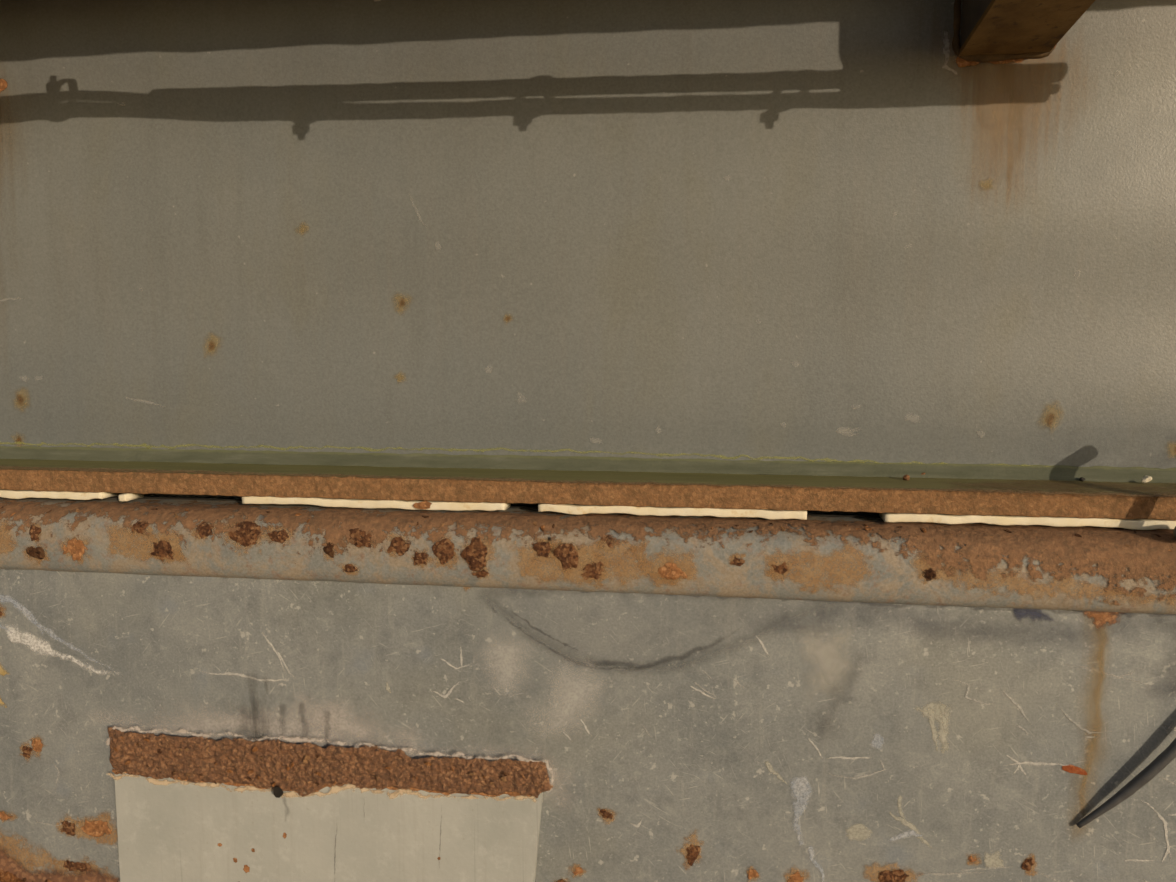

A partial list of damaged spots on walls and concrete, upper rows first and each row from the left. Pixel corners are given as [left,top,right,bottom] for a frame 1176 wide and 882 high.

corrosion [0,498,1176,629]
corrosion [20,737,43,759]
corrosion [1062,765,1088,775]
corrosion [598,808,615,824]
corrosion [0,811,119,882]
corrosion [680,834,702,869]
corrosion [785,868,809,882]
corrosion [865,863,917,882]
corrosion [1021,855,1036,876]